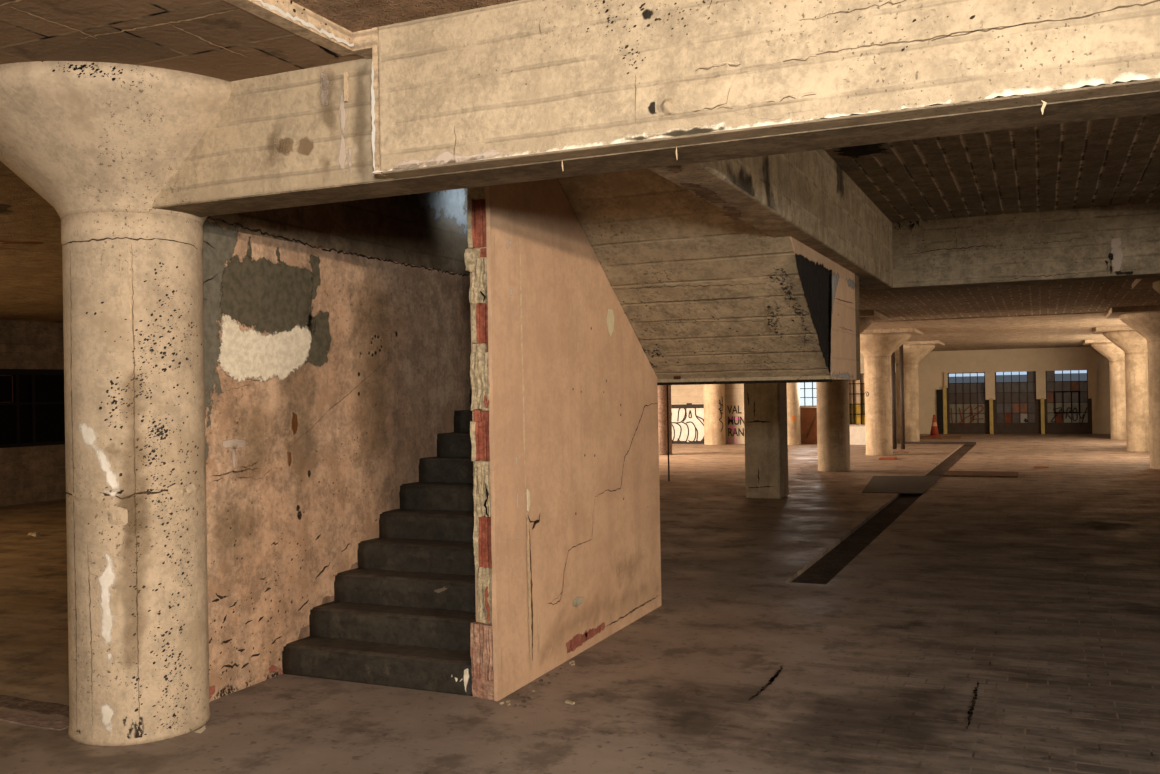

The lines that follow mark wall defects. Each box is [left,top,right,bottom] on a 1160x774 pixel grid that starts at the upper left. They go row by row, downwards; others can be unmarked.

crack [802,0,1160,55]
spalling [97,248,343,735]
spalling [451,186,494,700]
crack [548,403,657,605]